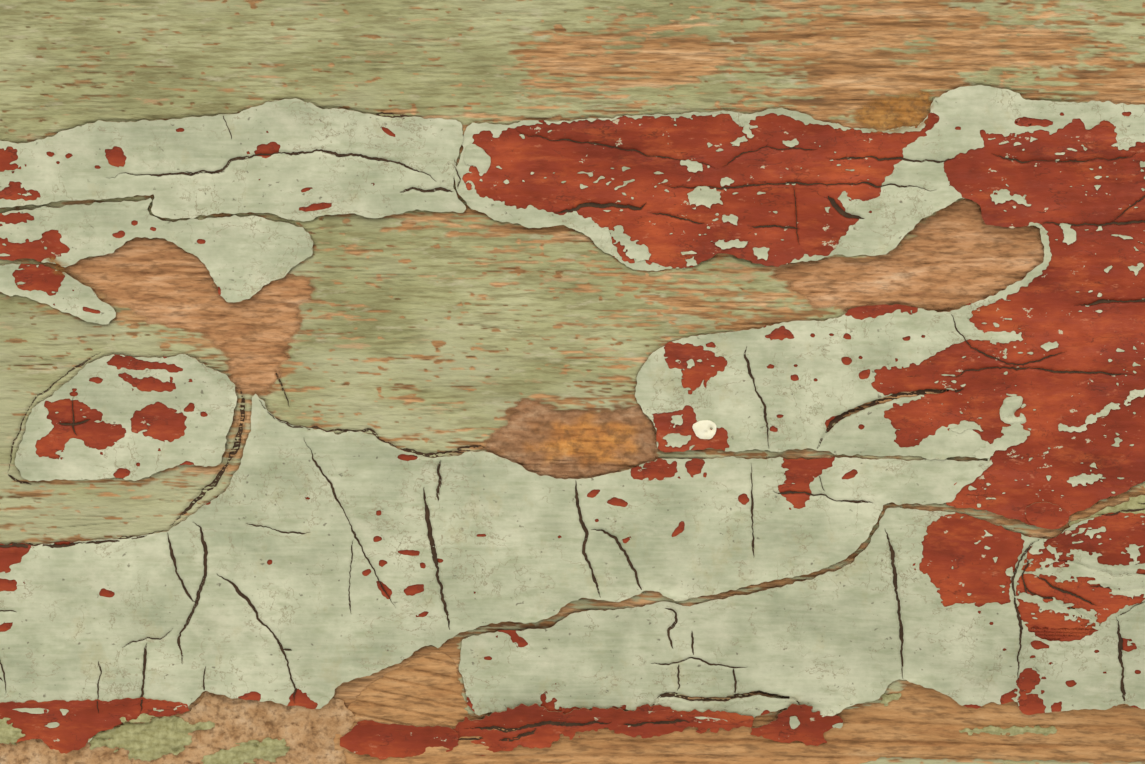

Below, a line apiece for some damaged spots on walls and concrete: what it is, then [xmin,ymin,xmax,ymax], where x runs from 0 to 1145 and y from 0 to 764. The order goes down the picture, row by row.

spalling [0,146,21,172]
spalling [0,181,41,201]
spalling [105,146,127,167]
peeling [0,198,314,481]
crack [744,347,872,555]
crack [0,373,484,713]
crack [575,483,642,598]
crack [458,608,801,741]
crack [885,531,904,678]
spalling [919,512,1040,607]
crack [1011,537,1145,705]
spalling [1015,495,1145,641]